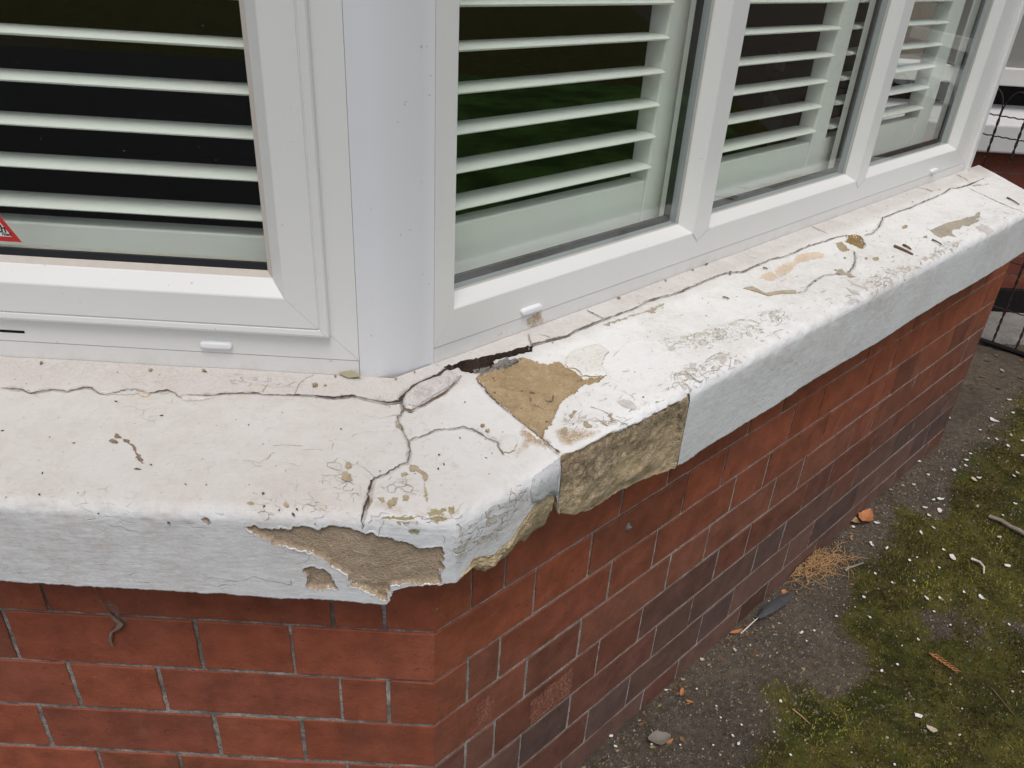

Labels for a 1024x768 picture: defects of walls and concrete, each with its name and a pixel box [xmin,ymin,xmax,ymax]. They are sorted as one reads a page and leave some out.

peeling [743,251,825,296]
flaking render [835,234,880,295]
flaking render [924,212,993,239]
crack [1,175,1024,563]
flaking render [474,344,609,441]
spalling [244,393,690,603]